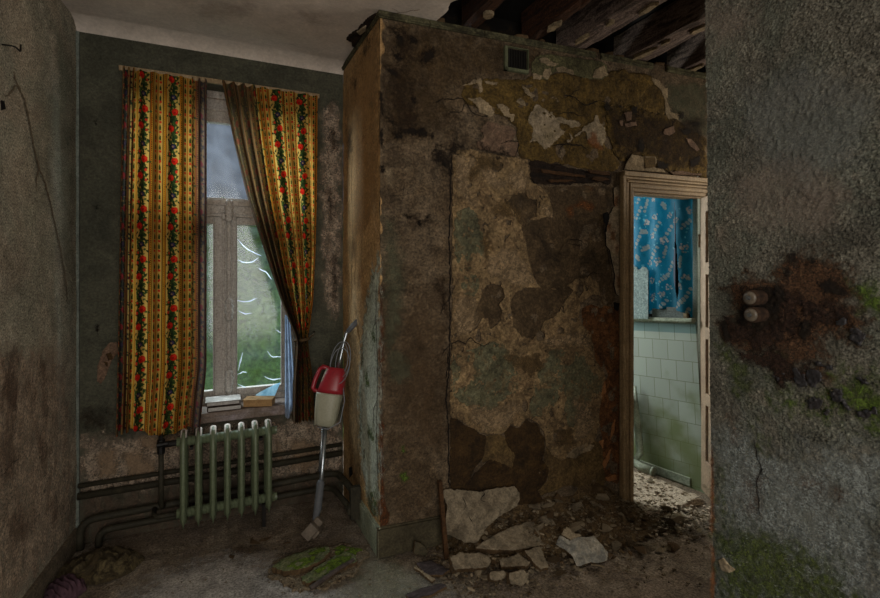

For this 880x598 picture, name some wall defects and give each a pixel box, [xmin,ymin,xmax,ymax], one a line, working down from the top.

water stain [320,28,509,311]
crack [441,155,490,521]
flaking render [449,54,707,505]
crack [754,445,774,514]